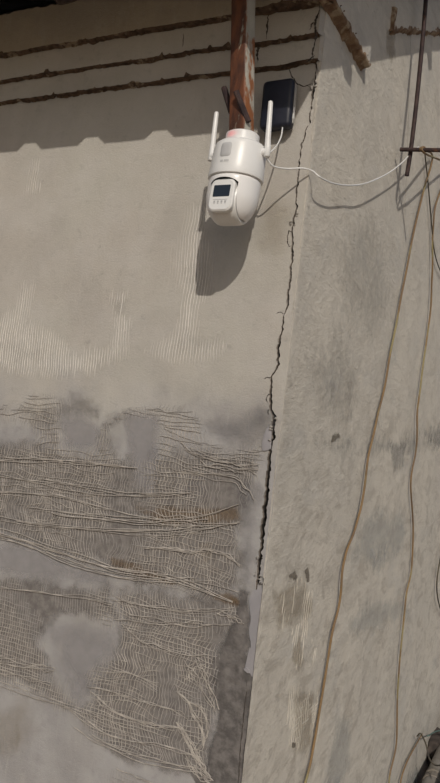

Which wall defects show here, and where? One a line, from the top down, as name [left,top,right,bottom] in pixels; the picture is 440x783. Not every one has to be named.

crack [255,5,320,590]
spalling [191,588,262,783]